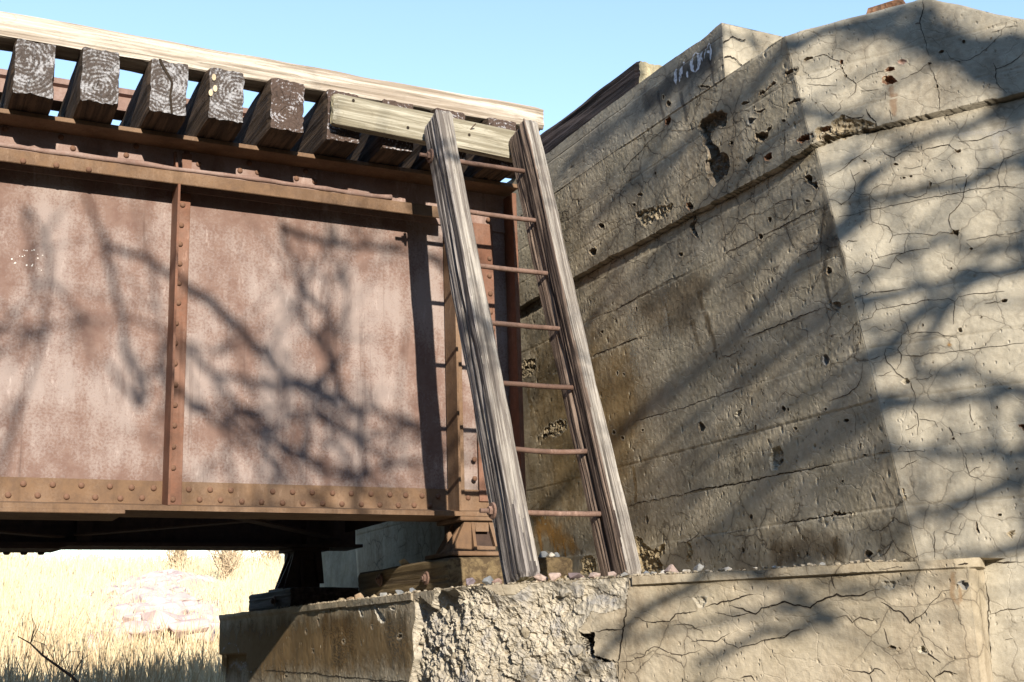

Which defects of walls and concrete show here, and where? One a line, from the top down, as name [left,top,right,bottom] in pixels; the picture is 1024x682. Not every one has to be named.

spalling [697,108,734,193]
spalling [795,113,896,147]
spalling [637,201,701,240]
crack [720,0,1024,469]
spalling [522,356,537,380]
crack [593,335,648,356]
crack [640,387,742,420]
crack [630,460,831,546]
spalling [396,554,629,682]
spalling [634,535,667,575]
crack [597,542,956,682]
crack [934,522,1024,653]